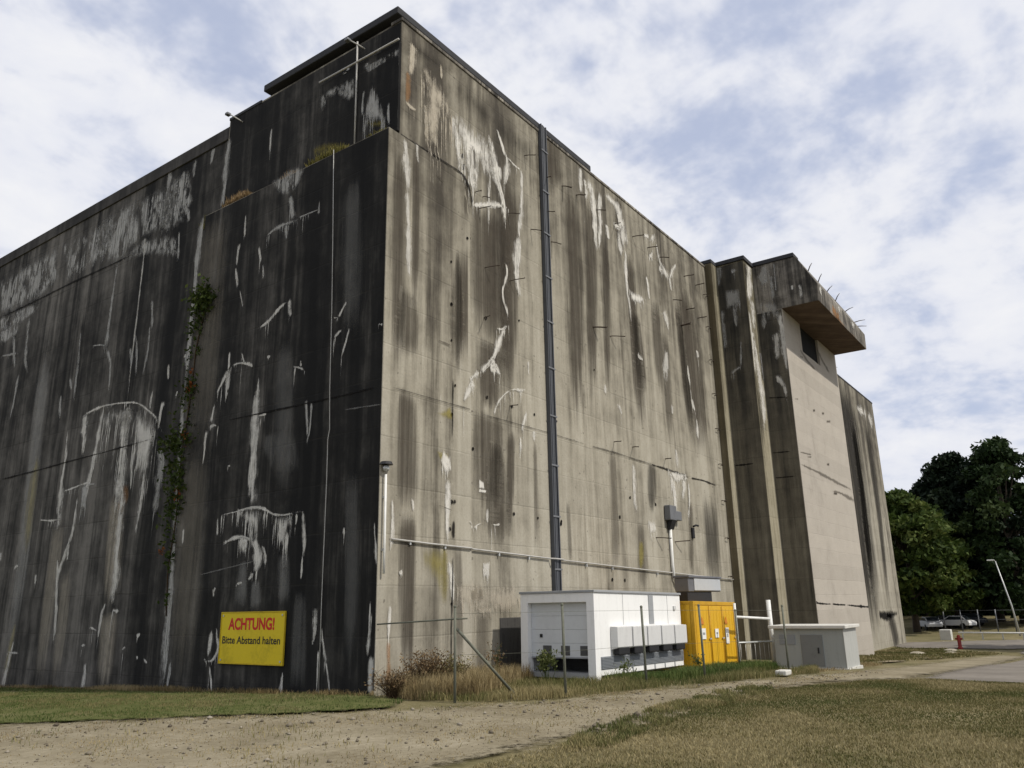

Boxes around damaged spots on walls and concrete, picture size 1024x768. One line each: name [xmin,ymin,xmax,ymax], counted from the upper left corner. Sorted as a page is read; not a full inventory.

damp [184,206,204,370]
damp [321,44,523,402]
damp [567,170,706,436]
damp [26,393,164,651]
damp [162,391,184,686]
efflorescence [203,353,252,461]
damp [217,379,306,585]
damp [388,502,414,658]
damp [398,396,415,510]
efflorescence [441,453,451,537]
damp [470,413,535,544]
damp [840,392,898,646]